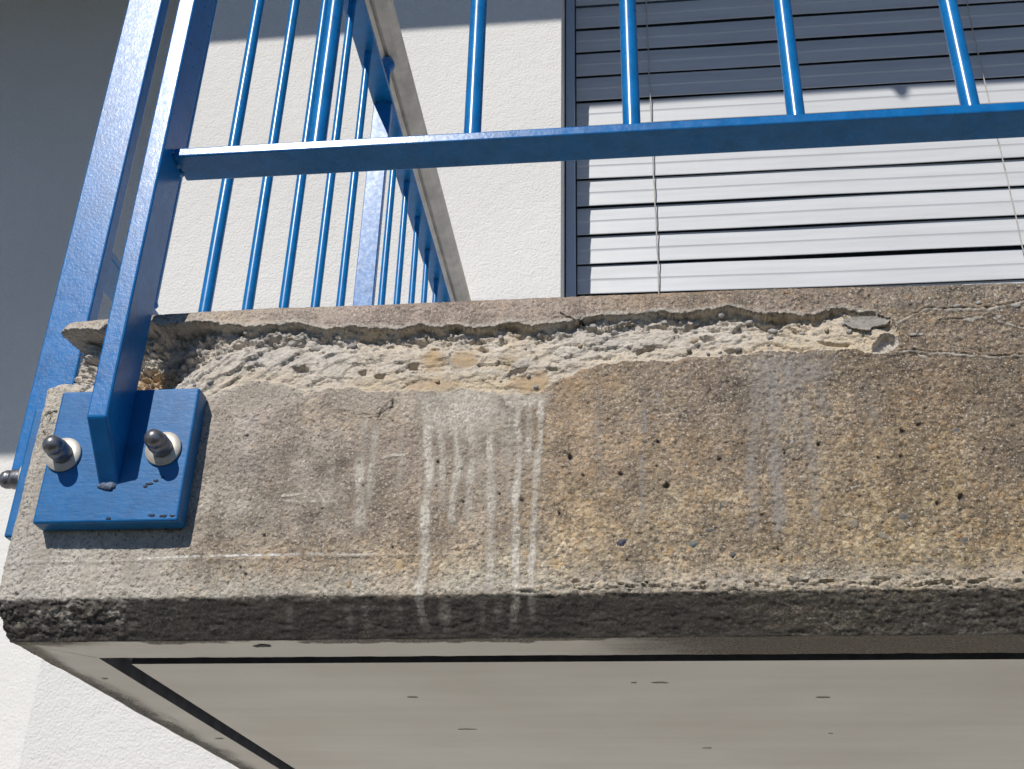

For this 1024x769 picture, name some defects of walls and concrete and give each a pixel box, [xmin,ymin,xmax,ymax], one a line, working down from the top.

crack [897,301,1024,328]
spalling [55,330,106,392]
spalling [137,306,899,397]
crack [903,350,1024,358]
water stain [414,390,548,596]